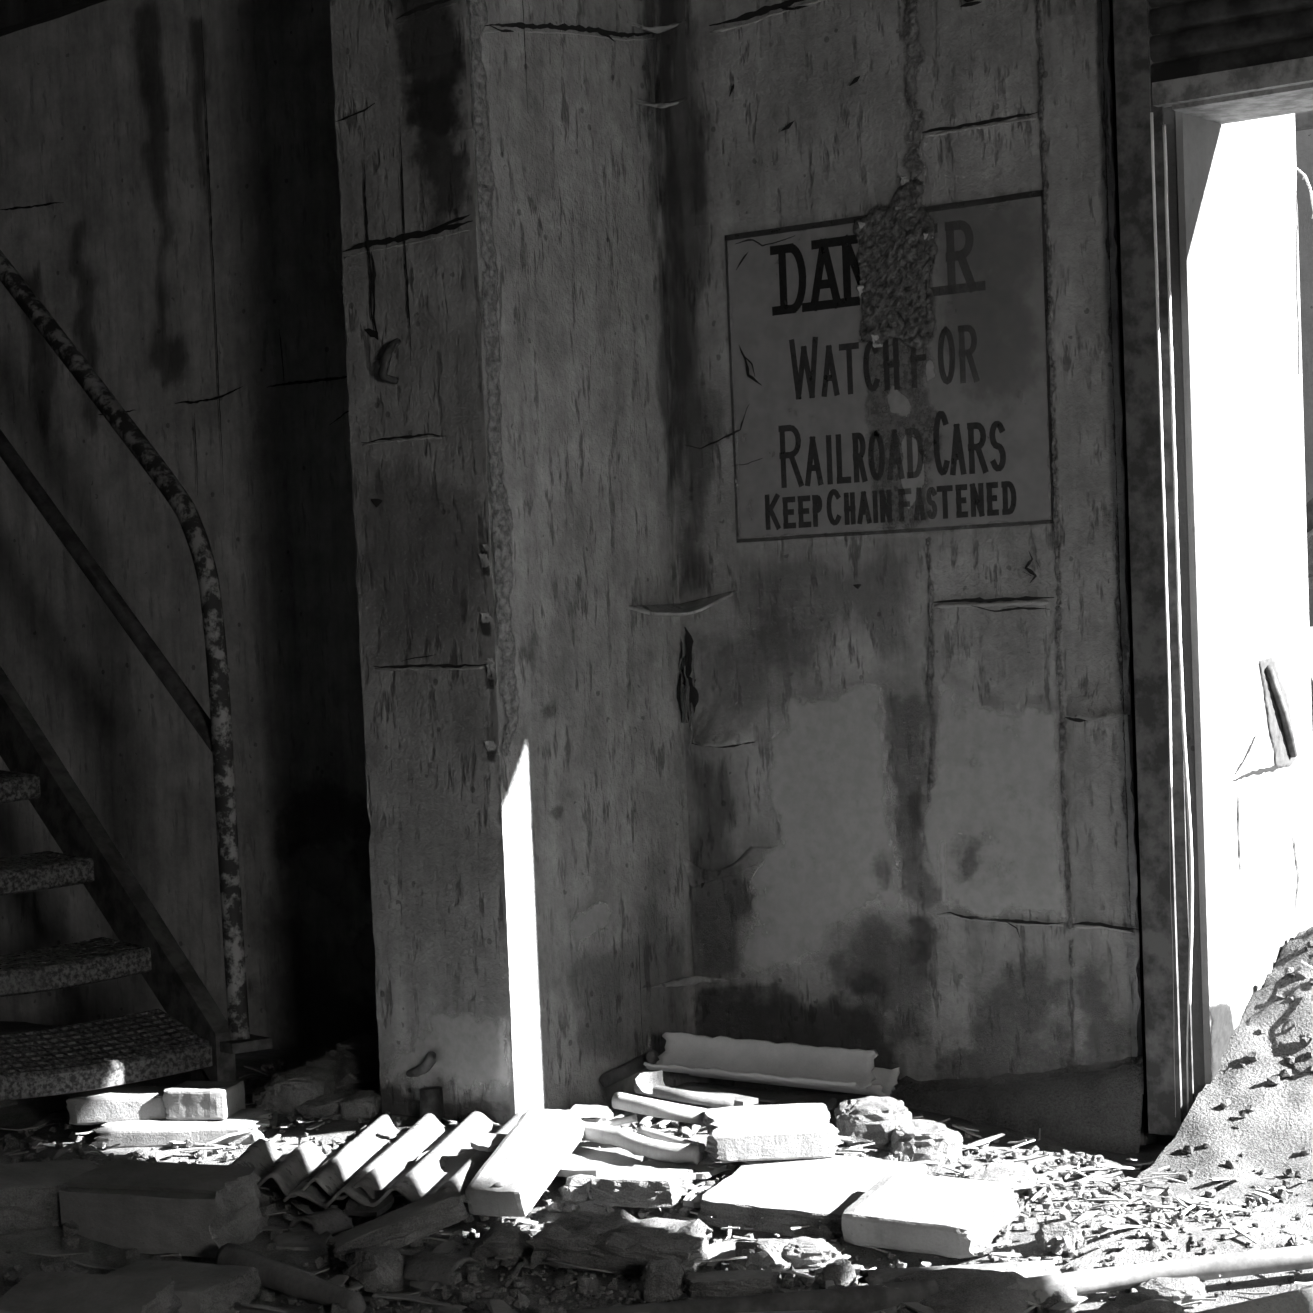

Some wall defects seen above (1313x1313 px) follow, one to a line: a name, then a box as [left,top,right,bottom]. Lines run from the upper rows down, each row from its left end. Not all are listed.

crack [483,0,656,107]
crack [709,0,825,33]
water stain [644,0,712,535]
water stain [695,686,935,1088]
water stain [709,1078,880,1097]
water stain [936,967,1131,1091]